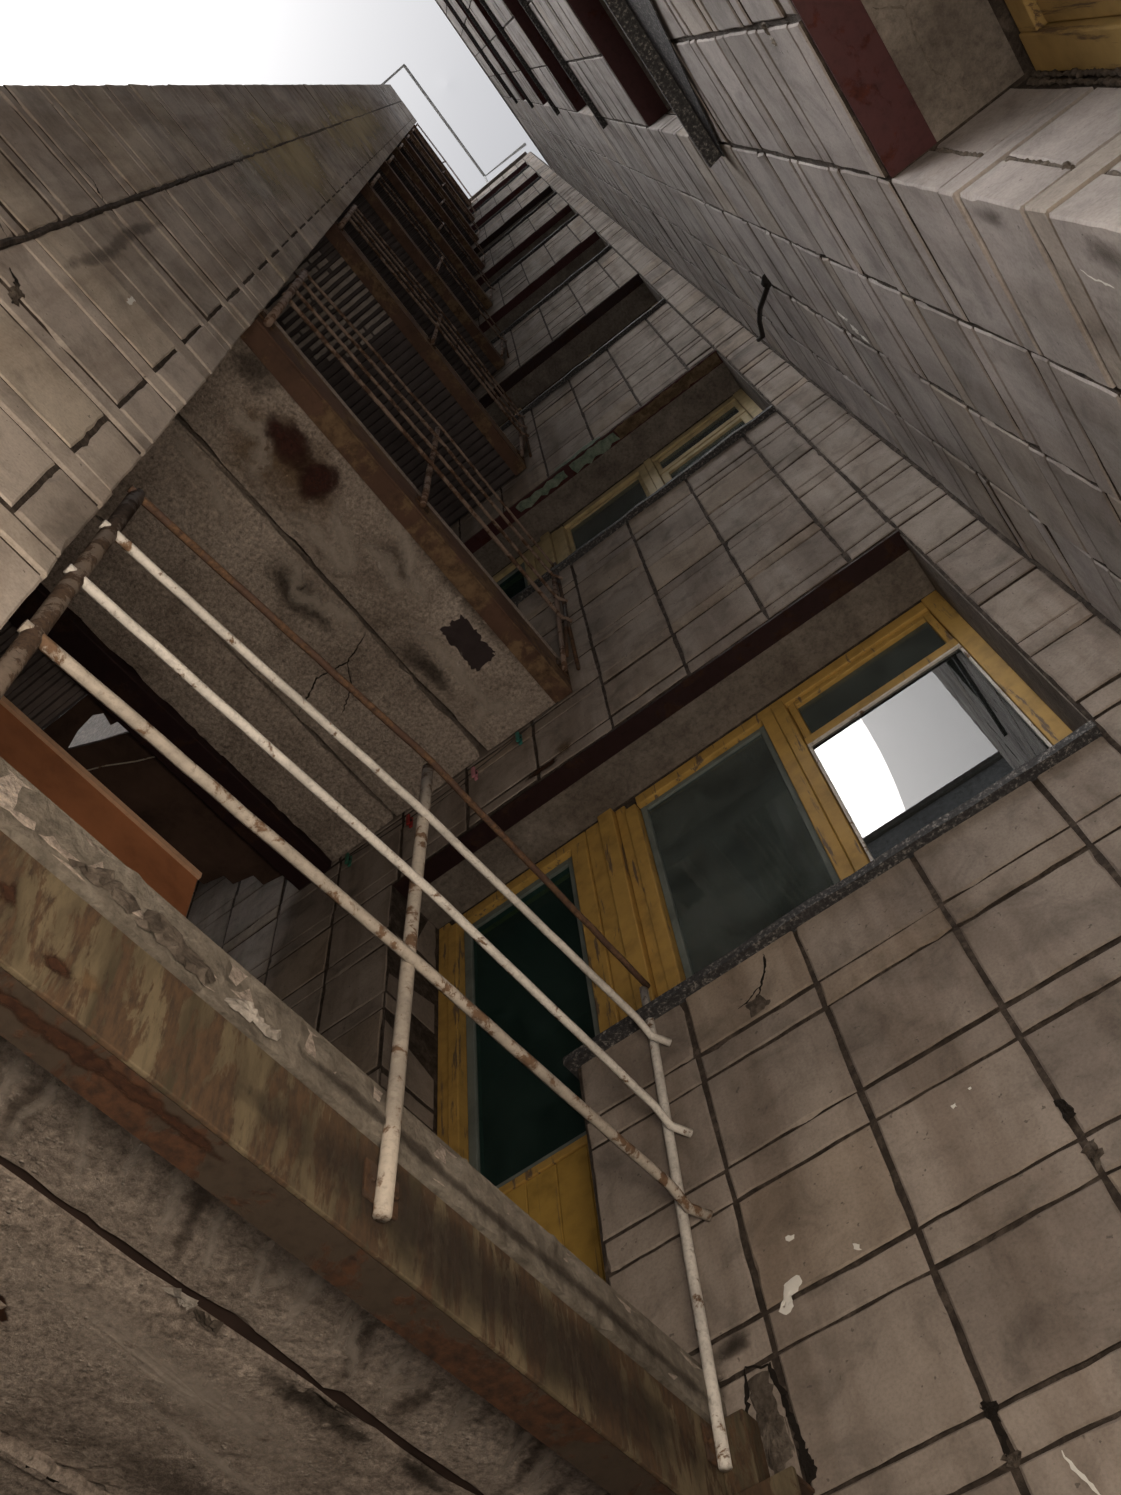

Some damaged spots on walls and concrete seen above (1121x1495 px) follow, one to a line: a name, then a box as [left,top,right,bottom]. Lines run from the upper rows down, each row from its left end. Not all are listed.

corrosion [45,955,96,989]
corrosion [0,991,221,1160]
corrosion [0,1295,8,1322]
spalling [744,1362,818,1485]